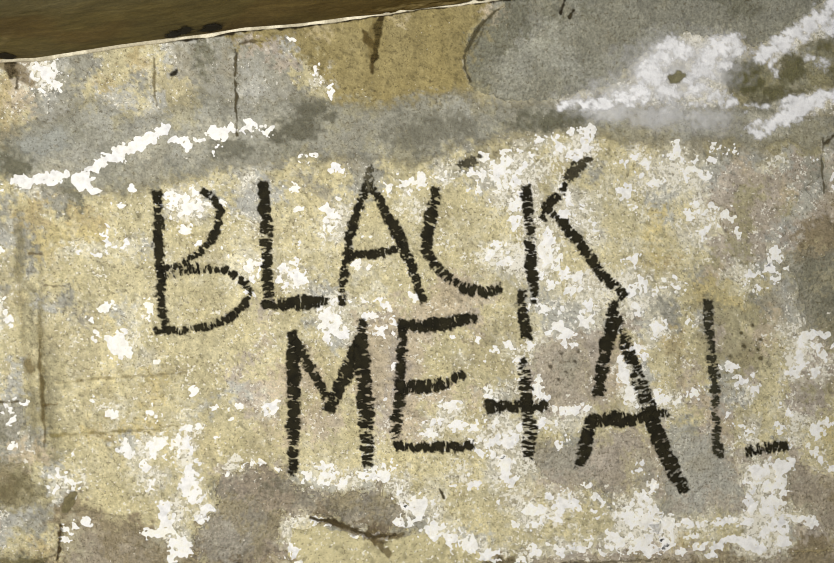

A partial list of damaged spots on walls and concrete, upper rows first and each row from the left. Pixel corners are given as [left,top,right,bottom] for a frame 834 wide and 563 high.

crack [559,0,575,19]
crack [178,0,511,136]
damp [0,0,834,196]
peeling [155,186,227,235]
peeling [378,123,597,232]
peeling [611,139,739,213]
peeling [315,297,398,346]
peeling [419,399,525,488]
spalling [114,402,502,563]
damp [0,552,46,563]
damp [57,506,202,563]
crack [309,513,404,558]